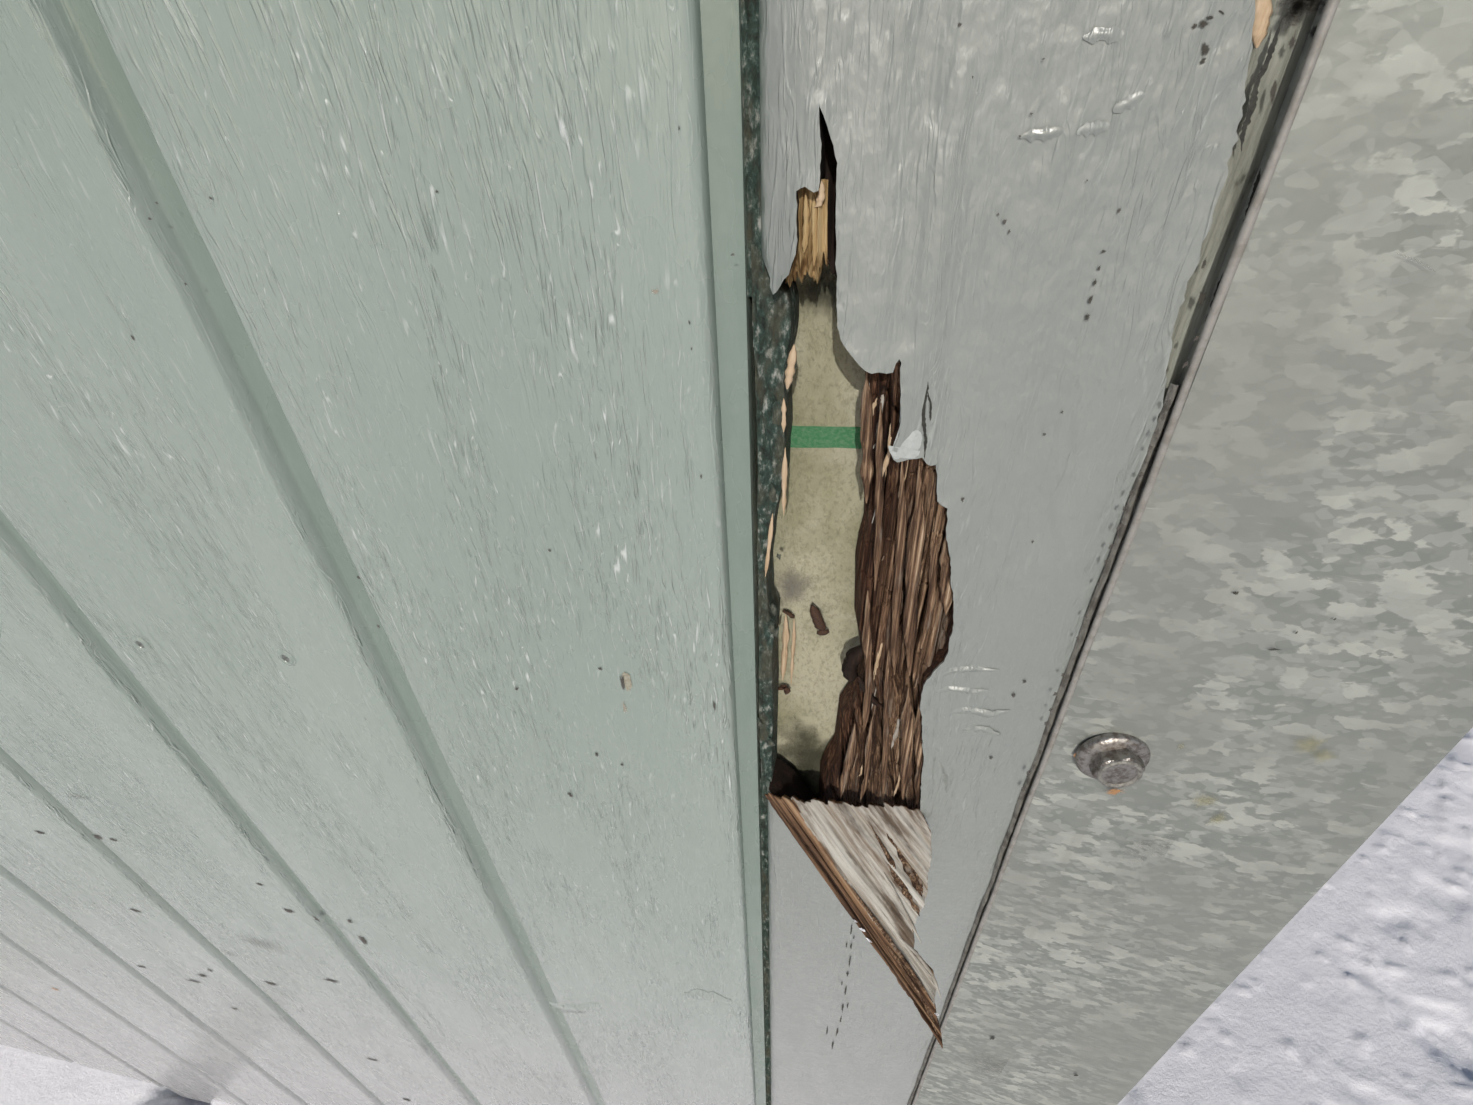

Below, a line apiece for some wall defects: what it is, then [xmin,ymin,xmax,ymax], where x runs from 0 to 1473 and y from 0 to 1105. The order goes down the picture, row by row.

peeling [731,244,799,798]
peeling [888,407,922,459]